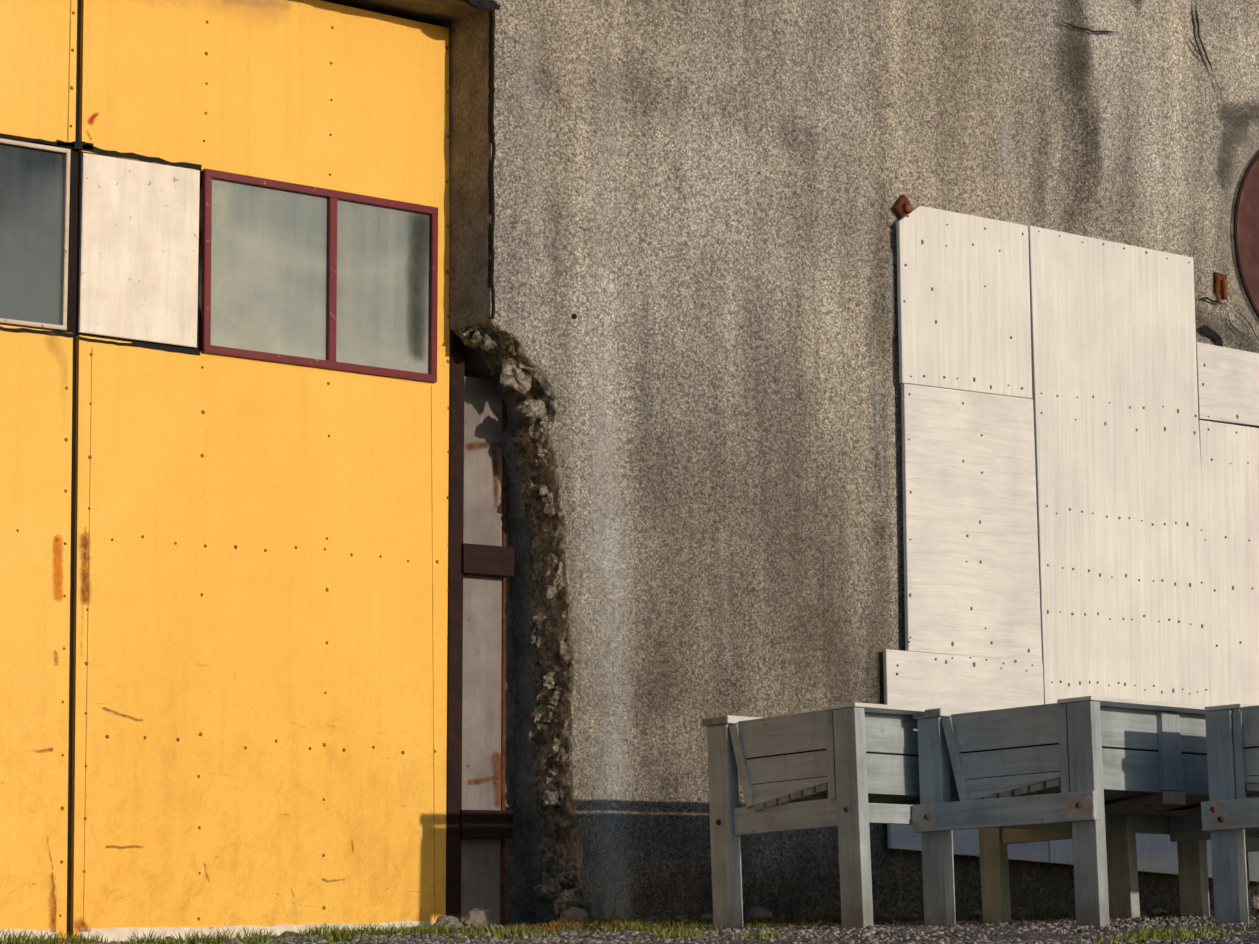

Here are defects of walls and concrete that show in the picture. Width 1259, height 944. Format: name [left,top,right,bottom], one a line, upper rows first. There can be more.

water stain [1062,0,1097,215]
crack [1061,0,1116,33]
crack [1189,6,1224,107]
spalling [455,320,601,920]